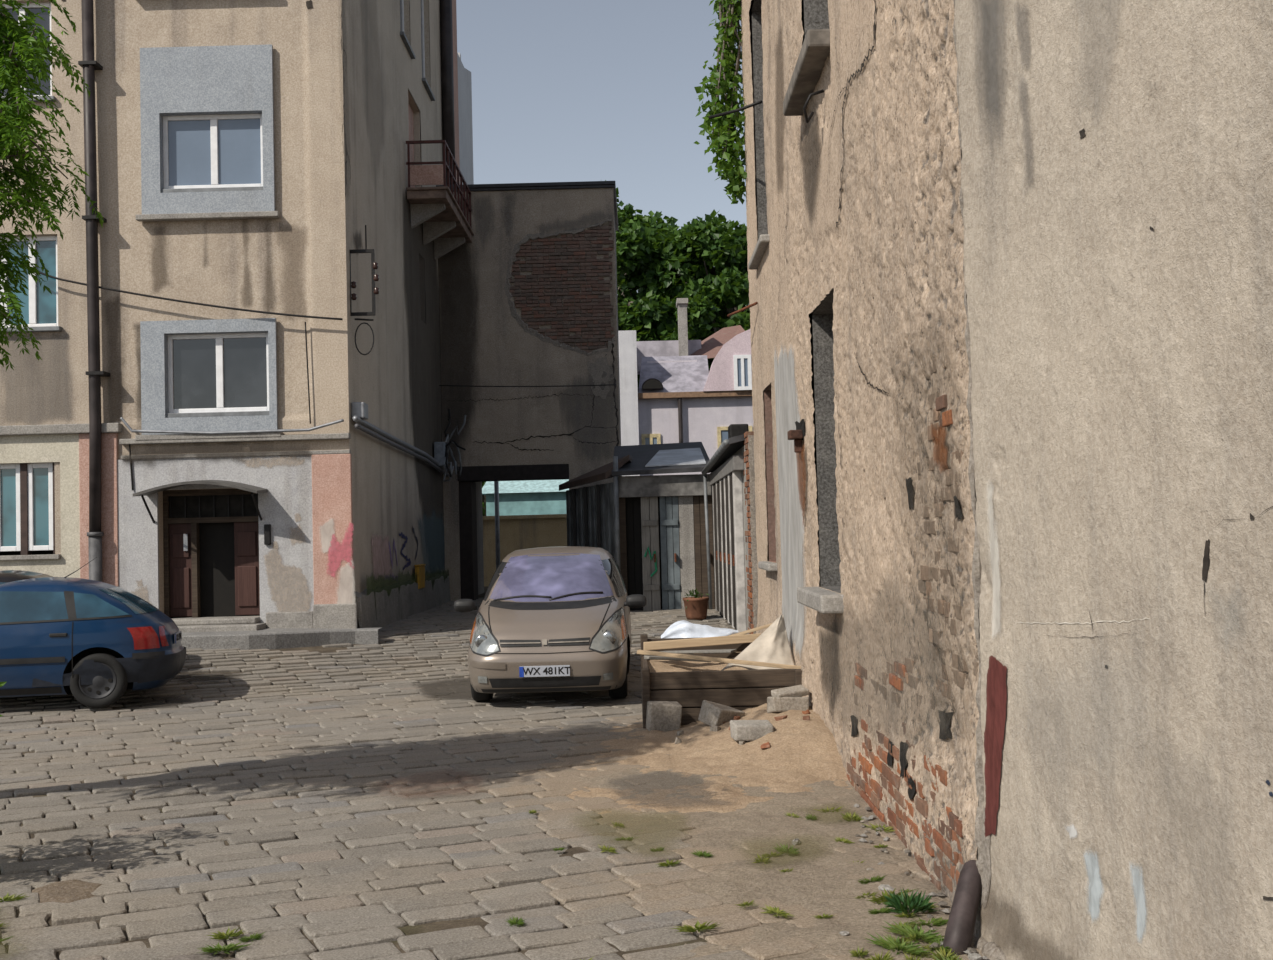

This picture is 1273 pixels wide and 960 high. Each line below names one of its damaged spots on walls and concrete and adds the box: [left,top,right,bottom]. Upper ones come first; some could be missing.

flaking render [504,218,617,356]
crack [473,343,619,451]
peeling [321,520,334,552]
peeling [338,561,355,604]
flaking render [847,359,980,892]
spalling [980,806,991,909]